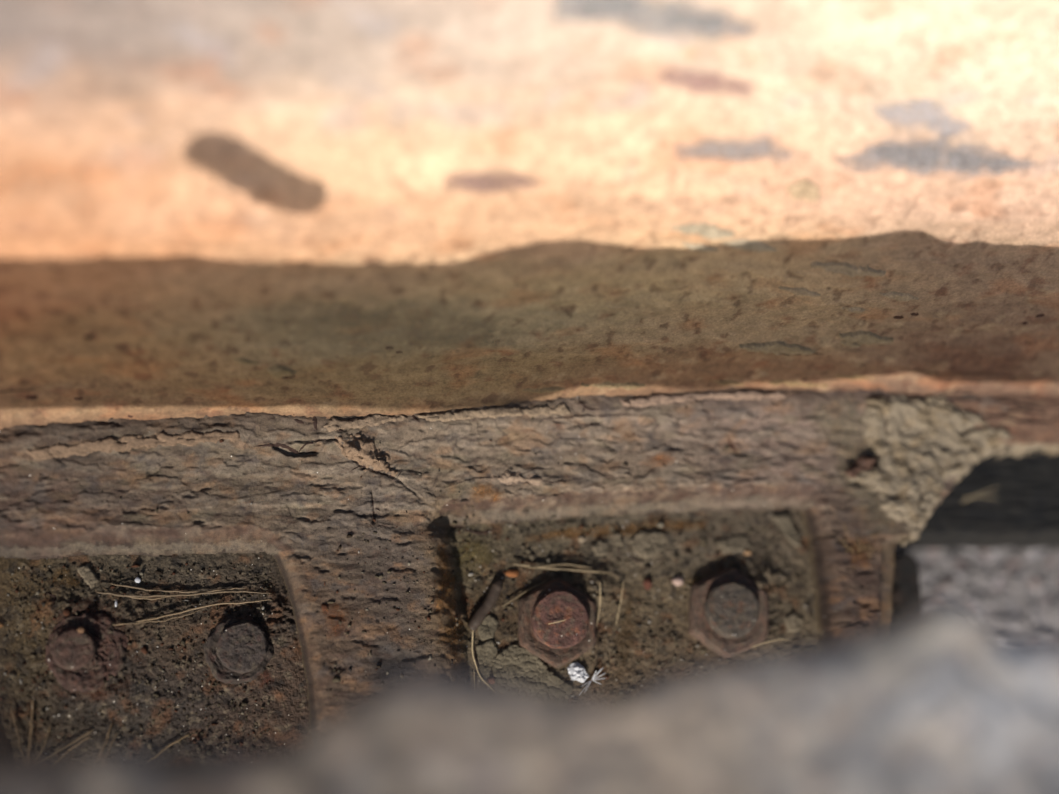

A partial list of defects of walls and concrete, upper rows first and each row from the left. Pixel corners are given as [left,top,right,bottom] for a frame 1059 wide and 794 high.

peeling [670,223,777,252]
crack [254,416,343,454]
crack [351,461,418,520]
crack [445,468,588,488]
rust [0,600,1059,794]